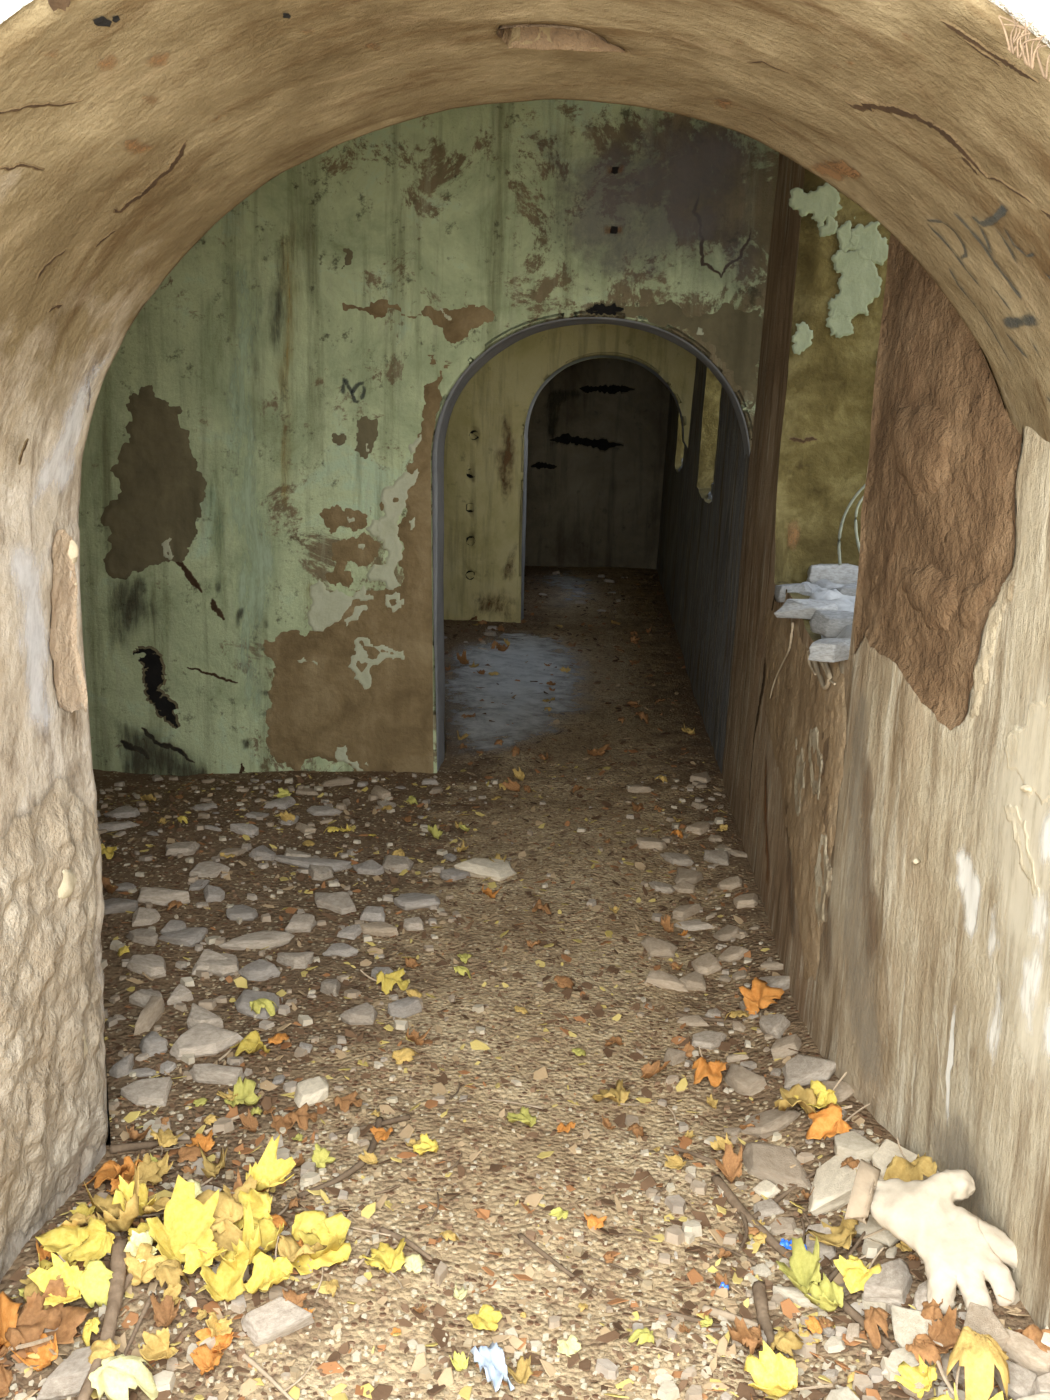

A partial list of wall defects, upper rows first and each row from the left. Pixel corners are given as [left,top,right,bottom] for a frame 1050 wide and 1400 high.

spalling [497,24,627,53]
flaking render [342,299,495,344]
crack [692,196,752,278]
spalling [48,529,88,713]
flaking render [100,385,207,580]
crack [120,646,238,763]
flaking render [263,355,450,773]
spalling [789,182,1023,731]